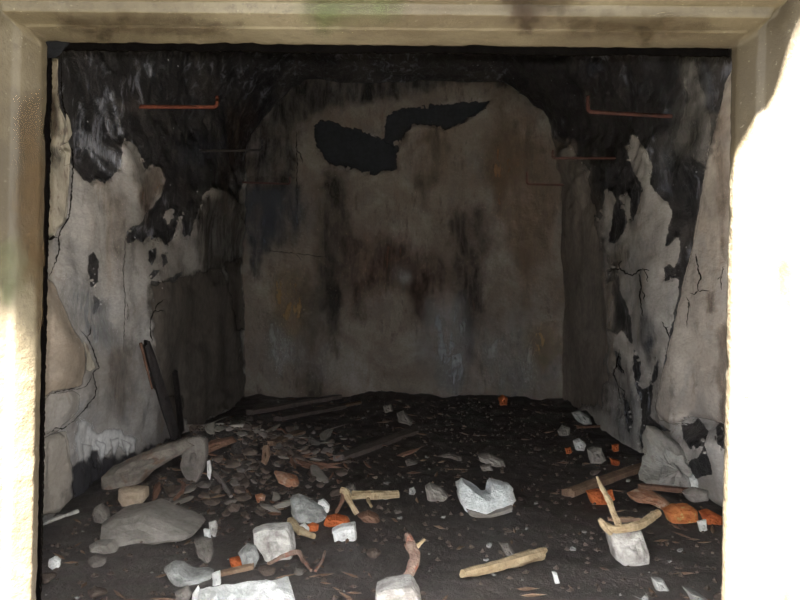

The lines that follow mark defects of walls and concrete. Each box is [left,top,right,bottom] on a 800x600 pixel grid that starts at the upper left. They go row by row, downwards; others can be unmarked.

crack [60,57,68,115]
crack [48,136,74,277]
spalling [49,50,307,289]
spalling [314,98,494,177]
spalling [88,252,102,314]
leakage [318,171,349,325]
leakage [434,208,484,393]
crack [603,261,649,316]
crack [686,254,724,323]
spalling [681,418,724,479]